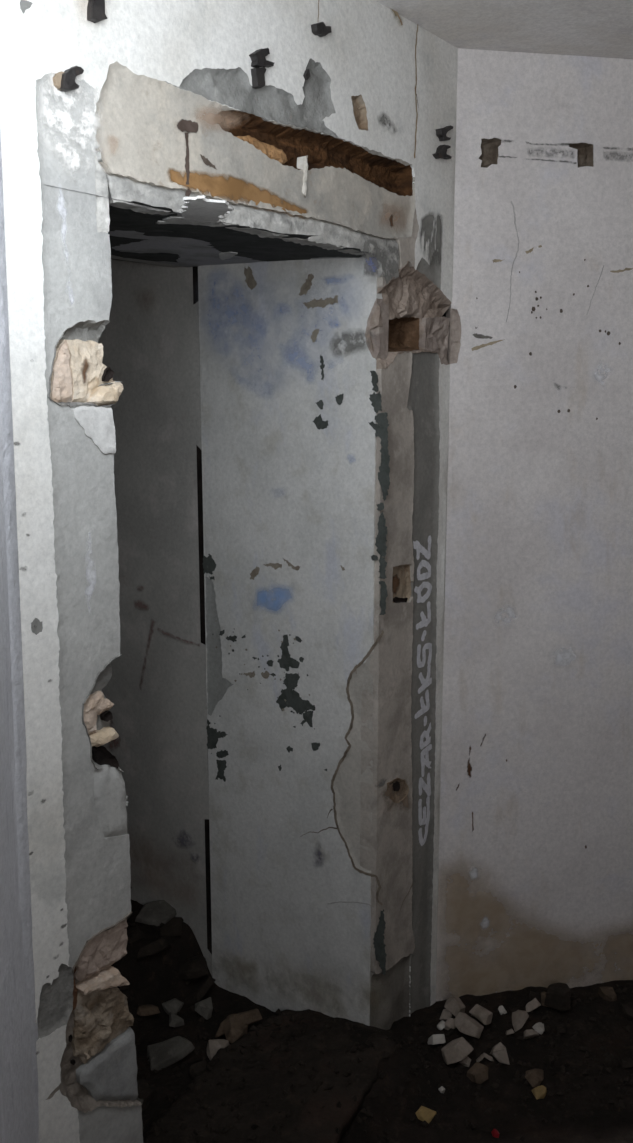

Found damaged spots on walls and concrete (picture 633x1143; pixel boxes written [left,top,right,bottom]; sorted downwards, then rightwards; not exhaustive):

rust [169,119,307,217]
spalling [31,618,43,635]
spalling [35,58,544,1143]
crack [300,630,413,910]
damp [446,868,633,997]